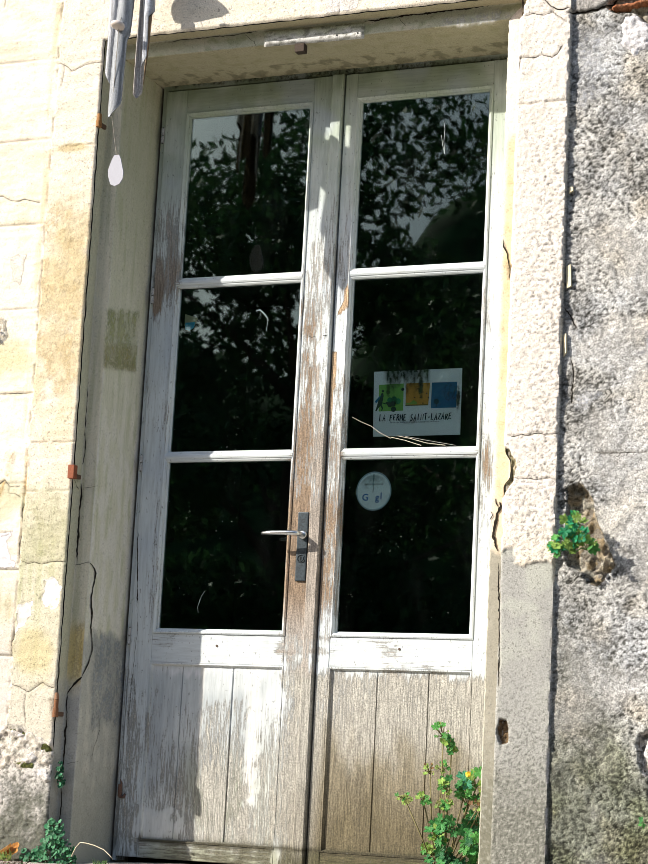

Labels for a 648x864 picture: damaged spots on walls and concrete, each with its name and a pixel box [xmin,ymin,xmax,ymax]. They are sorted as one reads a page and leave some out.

peeling [606,0,648,56]
water stain [104,310,137,369]
spalling [567,484,615,586]
crack [0,382,100,765]
crack [128,537,138,723]
peeling [0,724,54,783]
spalling [638,730,648,778]